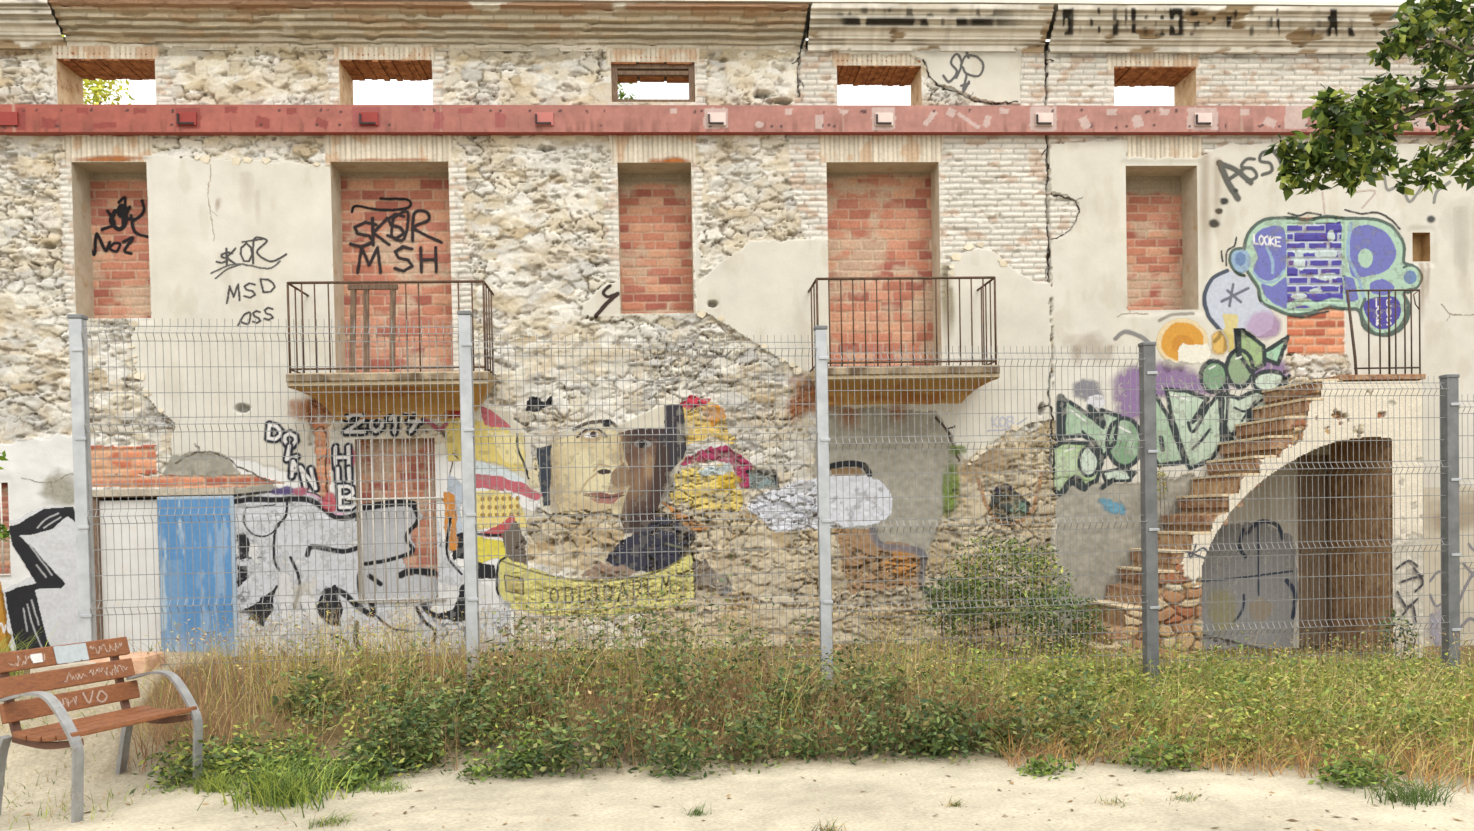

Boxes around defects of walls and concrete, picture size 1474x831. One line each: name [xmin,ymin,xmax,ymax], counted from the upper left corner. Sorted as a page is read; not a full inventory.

crack [922,49,1083,282]
flaking render [1360,135,1474,145]
flaking render [0,135,1334,651]
flaking render [1283,352,1352,383]